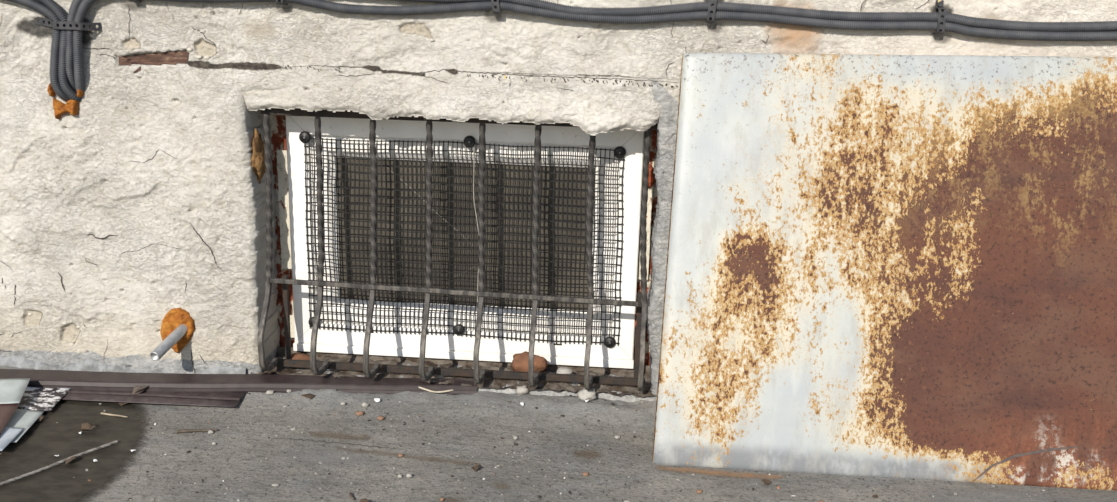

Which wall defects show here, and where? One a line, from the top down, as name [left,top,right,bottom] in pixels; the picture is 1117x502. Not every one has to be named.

spalling [118,38,321,73]
crack [283,65,381,76]
crack [419,0,686,91]
spalling [467,74,677,88]
leakage [0,400,146,502]